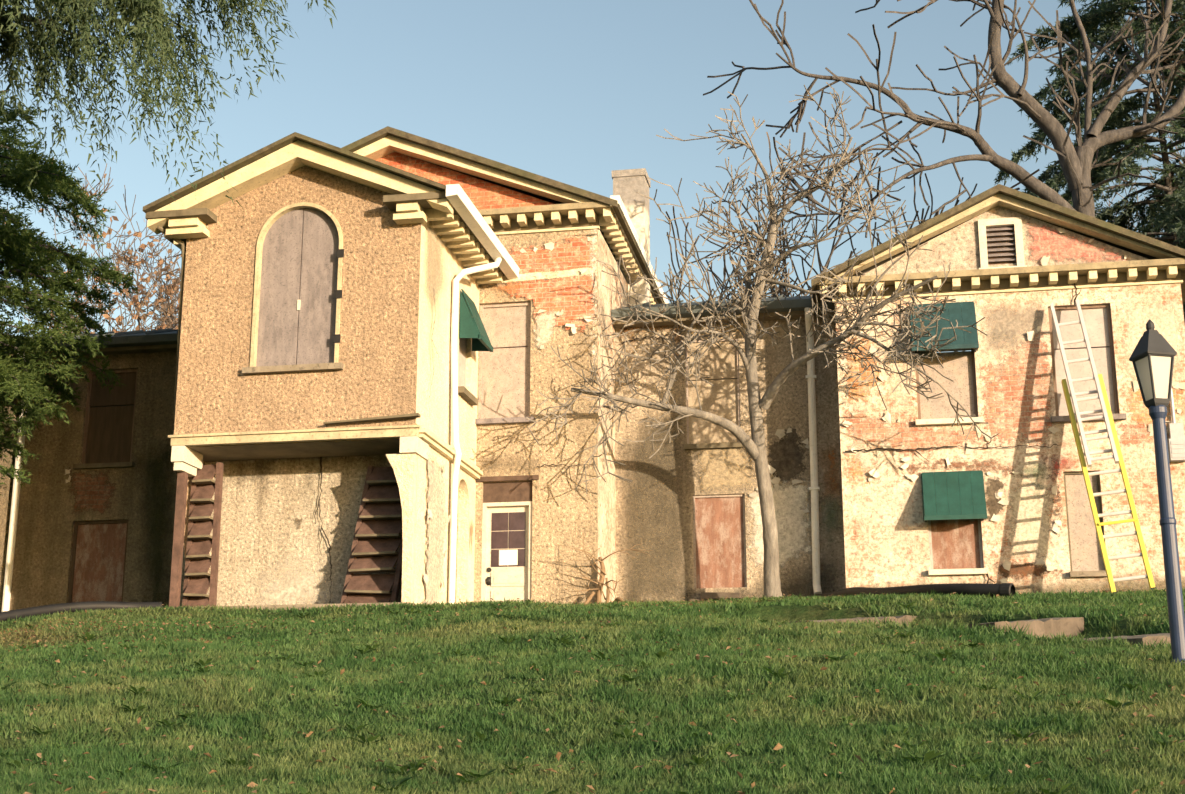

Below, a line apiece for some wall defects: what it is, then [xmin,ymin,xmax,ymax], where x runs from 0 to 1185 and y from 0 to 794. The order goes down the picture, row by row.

flaking render [499,236,597,352]
flaking render [839,326,1059,522]
flaking render [1117,380,1185,447]
crack [314,457,332,604]
peeling [749,428,811,565]